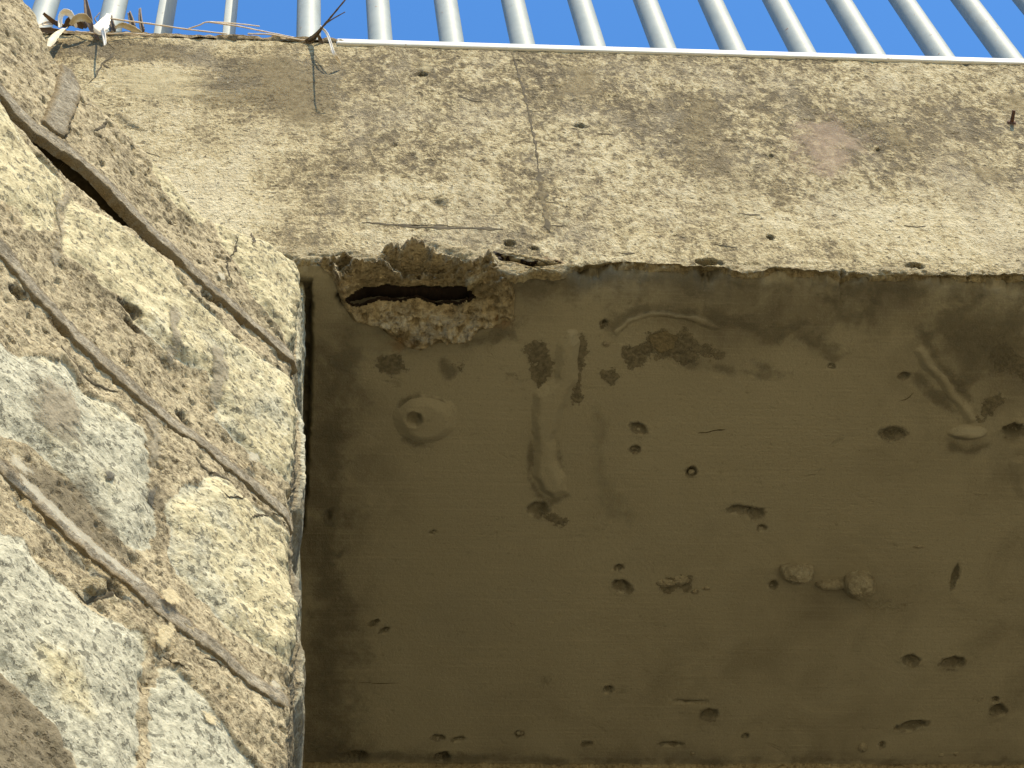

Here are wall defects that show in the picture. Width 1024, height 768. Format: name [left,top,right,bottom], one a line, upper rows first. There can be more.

crack [511,53,551,231]
spalling [277,237,579,378]